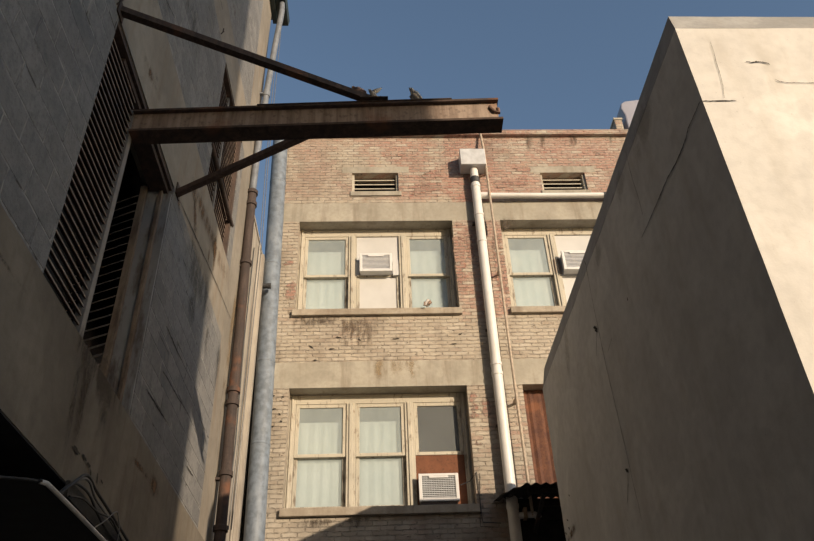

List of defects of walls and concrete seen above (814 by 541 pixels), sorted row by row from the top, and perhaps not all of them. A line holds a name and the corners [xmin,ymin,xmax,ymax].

crack [627,42,736,236]